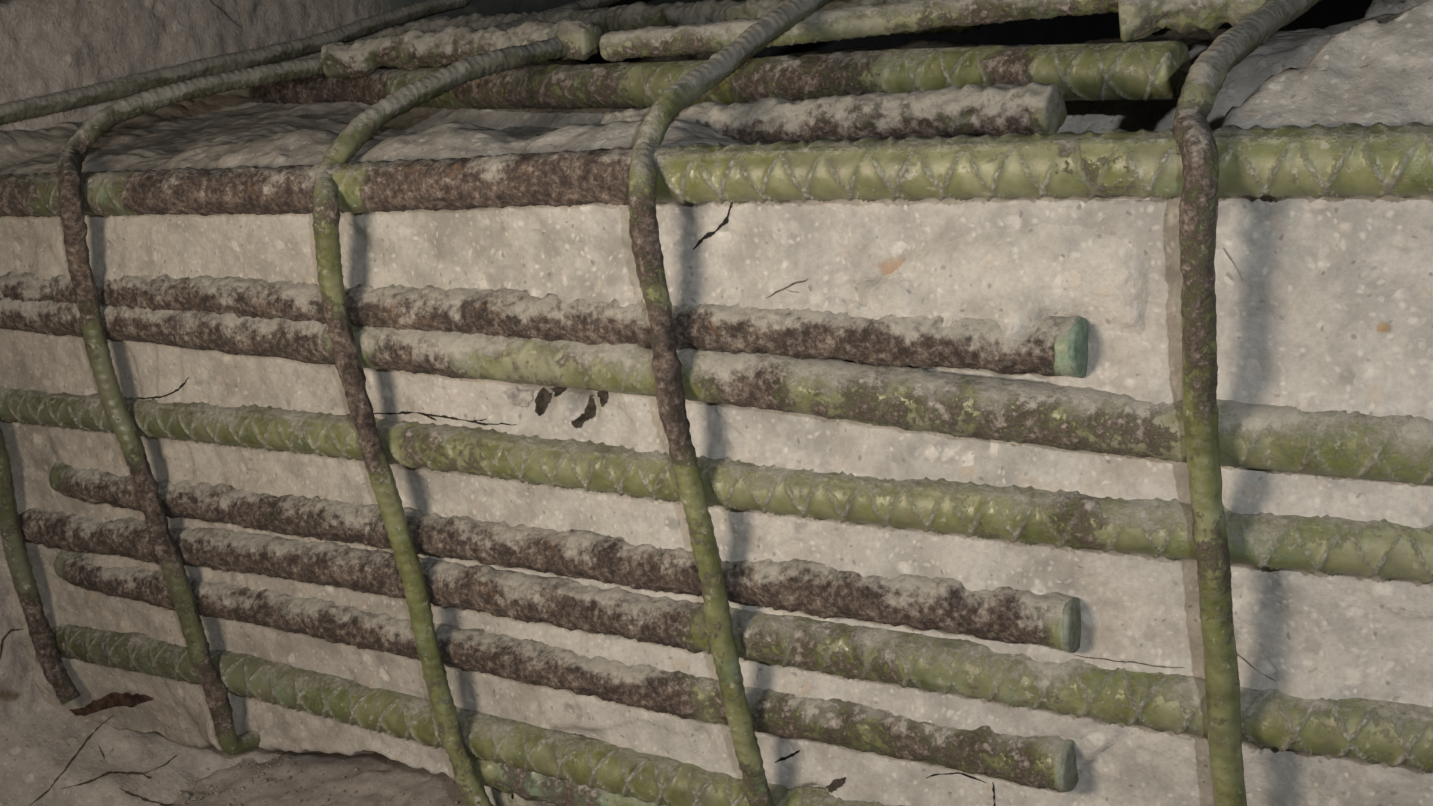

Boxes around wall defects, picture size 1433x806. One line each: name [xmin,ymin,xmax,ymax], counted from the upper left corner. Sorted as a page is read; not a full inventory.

spalling [504,386,567,416]
spalling [571,391,609,428]
spalling [821,777,846,793]